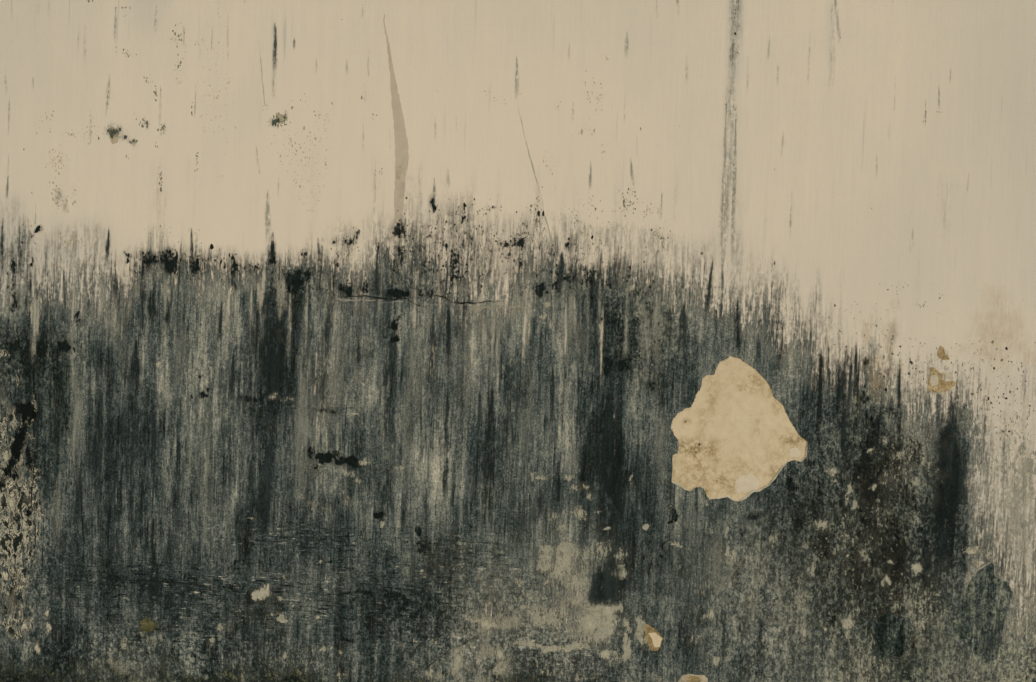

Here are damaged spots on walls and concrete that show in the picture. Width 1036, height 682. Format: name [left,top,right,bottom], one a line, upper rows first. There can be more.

damp [45,110,138,213]
damp [721,104,736,219]
damp [0,187,1036,682]
spalling [671,356,807,506]
peeling [927,346,956,394]
peeling [397,474,663,682]
spalling [669,399,1036,682]